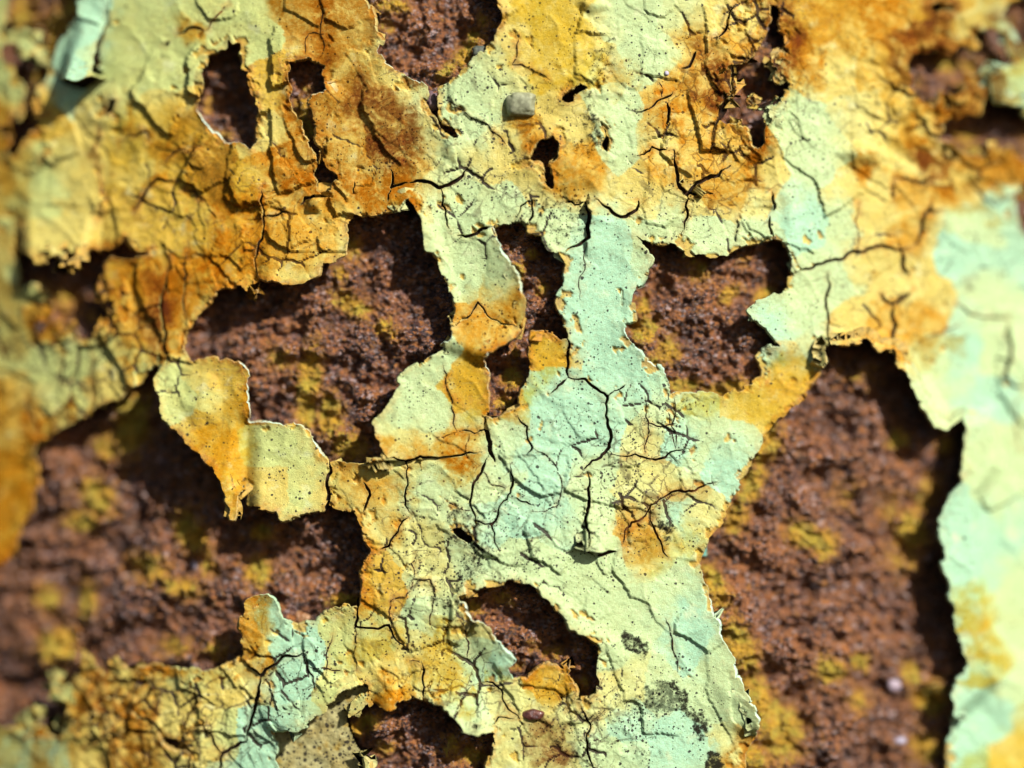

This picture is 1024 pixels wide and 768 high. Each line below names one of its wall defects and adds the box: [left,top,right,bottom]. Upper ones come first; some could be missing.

peeling [197,41,258,149]
crack [243,191,315,270]
peeling [367,0,502,138]
crack [387,168,490,238]
crack [636,66,734,232]
crack [768,194,776,236]
peeling [0,60,628,768]
crack [383,338,713,557]
peeling [586,177,1008,768]
crack [85,556,436,768]
corrosion [294,610,310,623]
crack [560,696,604,768]